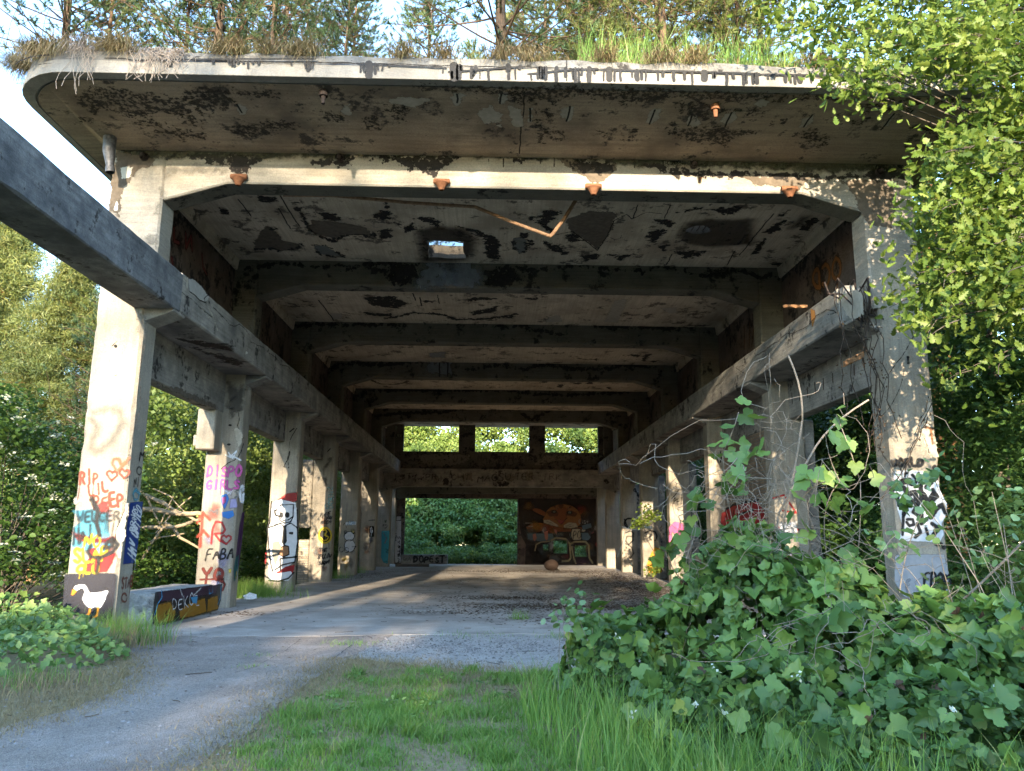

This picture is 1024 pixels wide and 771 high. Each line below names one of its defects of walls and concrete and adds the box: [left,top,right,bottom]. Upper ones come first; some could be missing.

leakage [360,60,391,79]
leakage [442,62,490,81]
leakage [118,150,437,174]
leakage [562,158,902,174]
peeling [483,210,812,282]